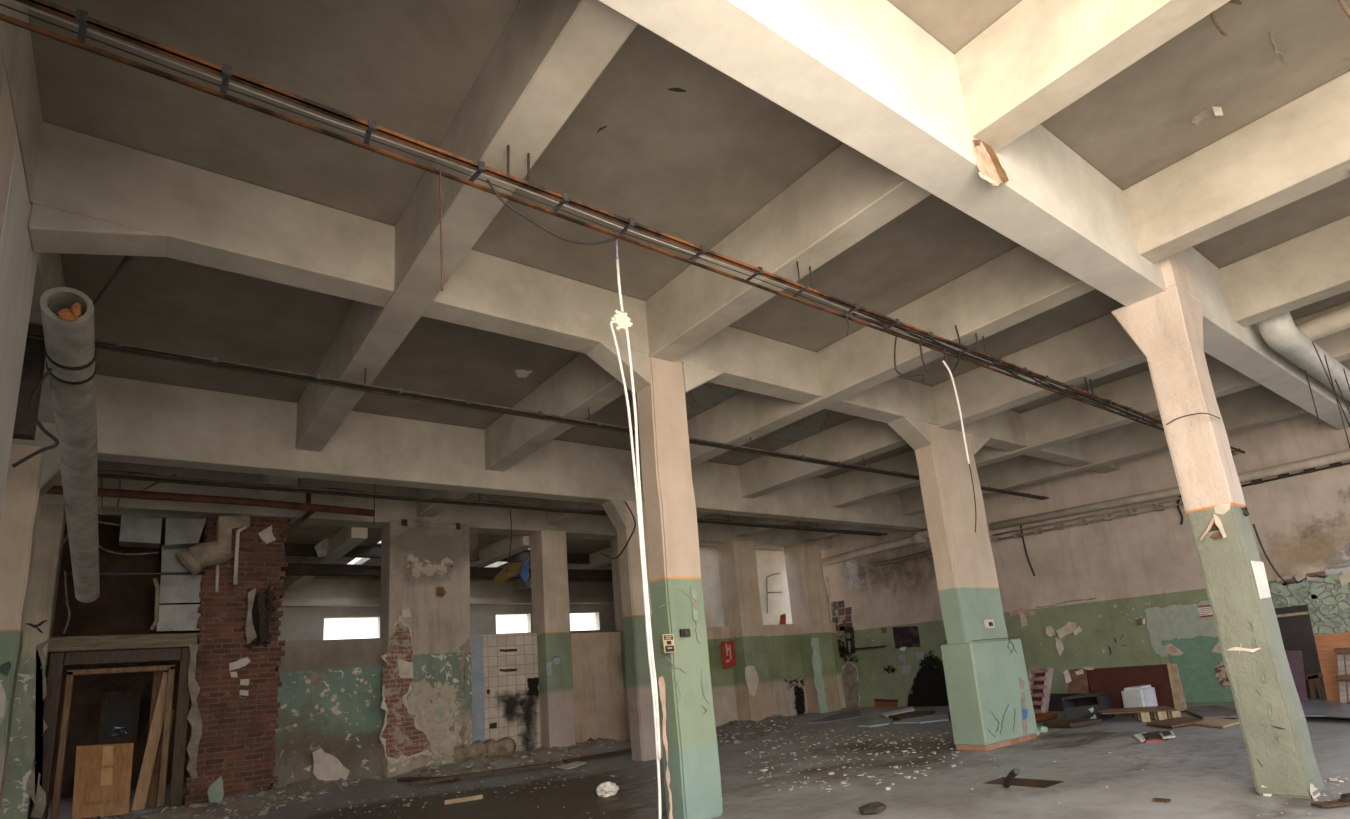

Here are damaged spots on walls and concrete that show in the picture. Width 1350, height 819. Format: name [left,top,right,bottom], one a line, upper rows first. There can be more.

spalling [972,139,1009,187]
water stain [1281,531,1350,587]
peeling [1268,571,1350,643]
peeling [1046,622,1083,656]
flaking render [303,615,470,764]